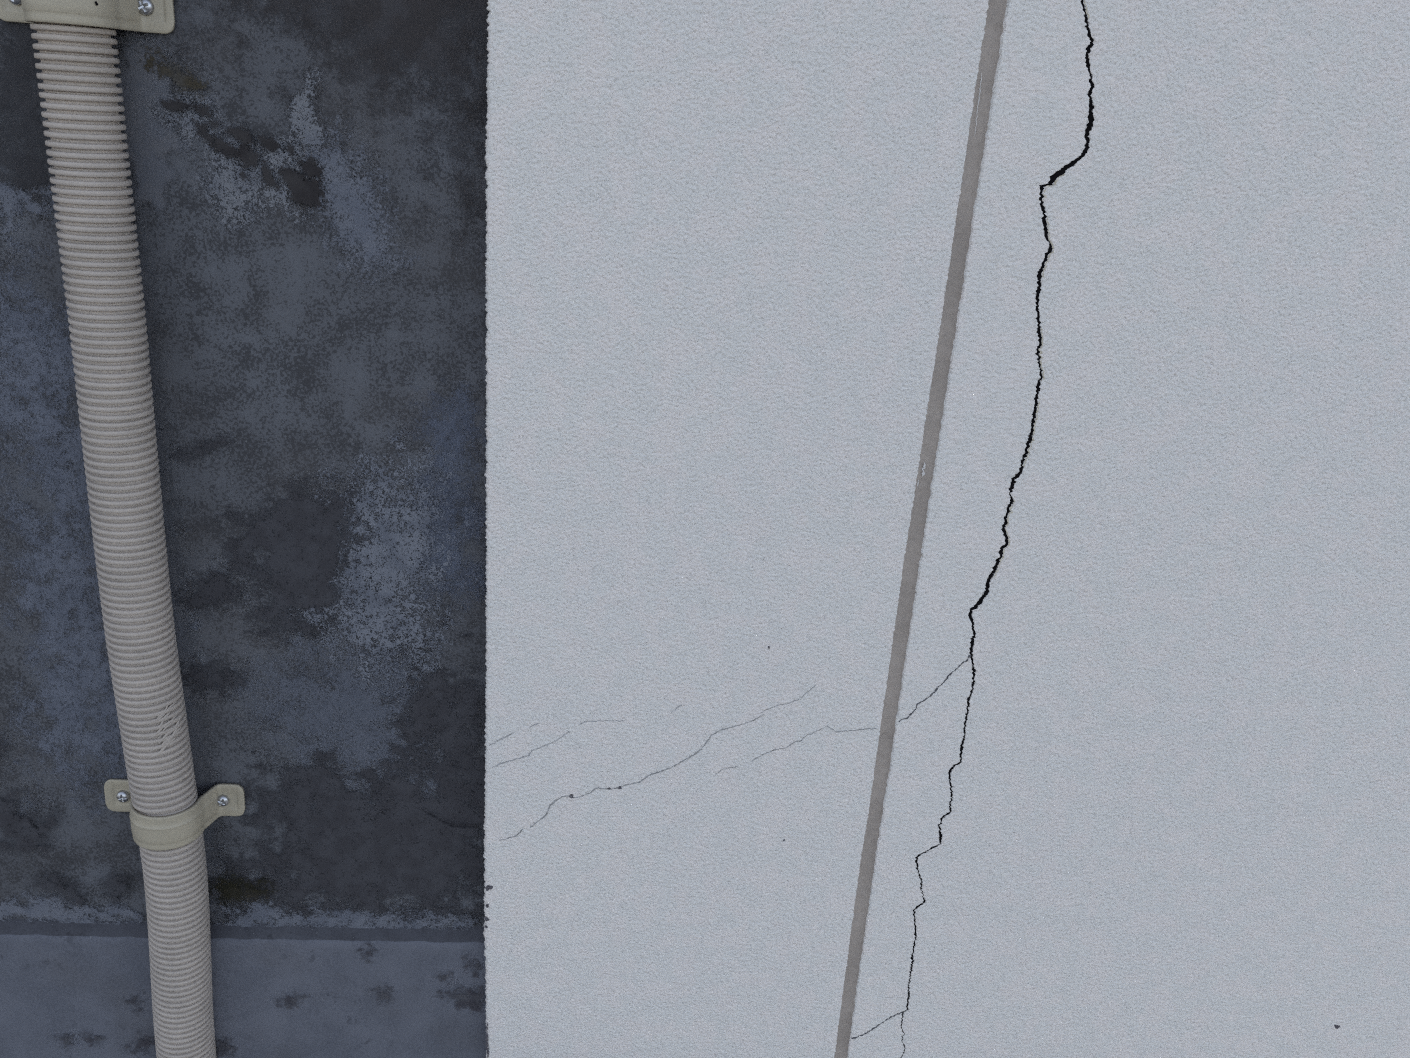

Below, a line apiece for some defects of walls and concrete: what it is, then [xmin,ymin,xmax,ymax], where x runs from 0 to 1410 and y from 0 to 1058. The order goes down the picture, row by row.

damp [0,20,143,925]
damp [115,30,188,211]
damp [133,231,487,964]
crack [422,0,1095,1058]